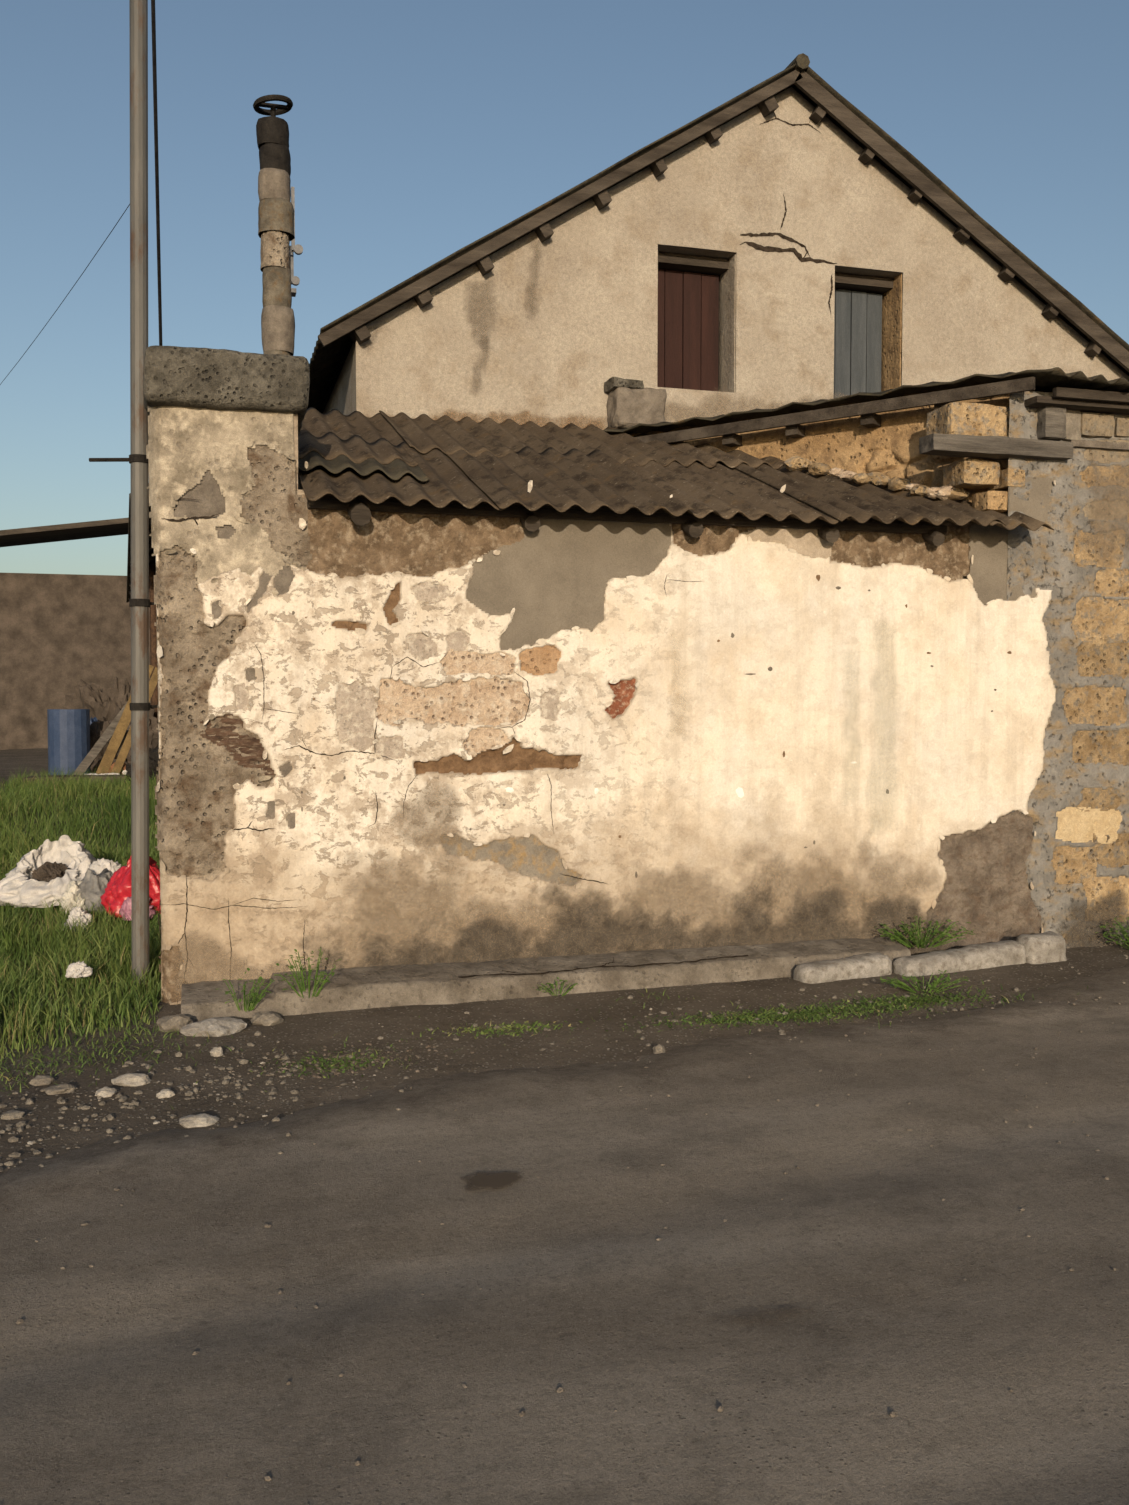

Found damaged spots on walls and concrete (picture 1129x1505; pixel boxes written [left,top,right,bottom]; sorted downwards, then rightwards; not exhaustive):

crack [740,193,837,313]
flaking render [672,511,974,583]
flaking render [146,406,585,889]
flaking render [605,678,640,719]
leakage [362,867,959,967]
flaking render [927,810,1043,950]